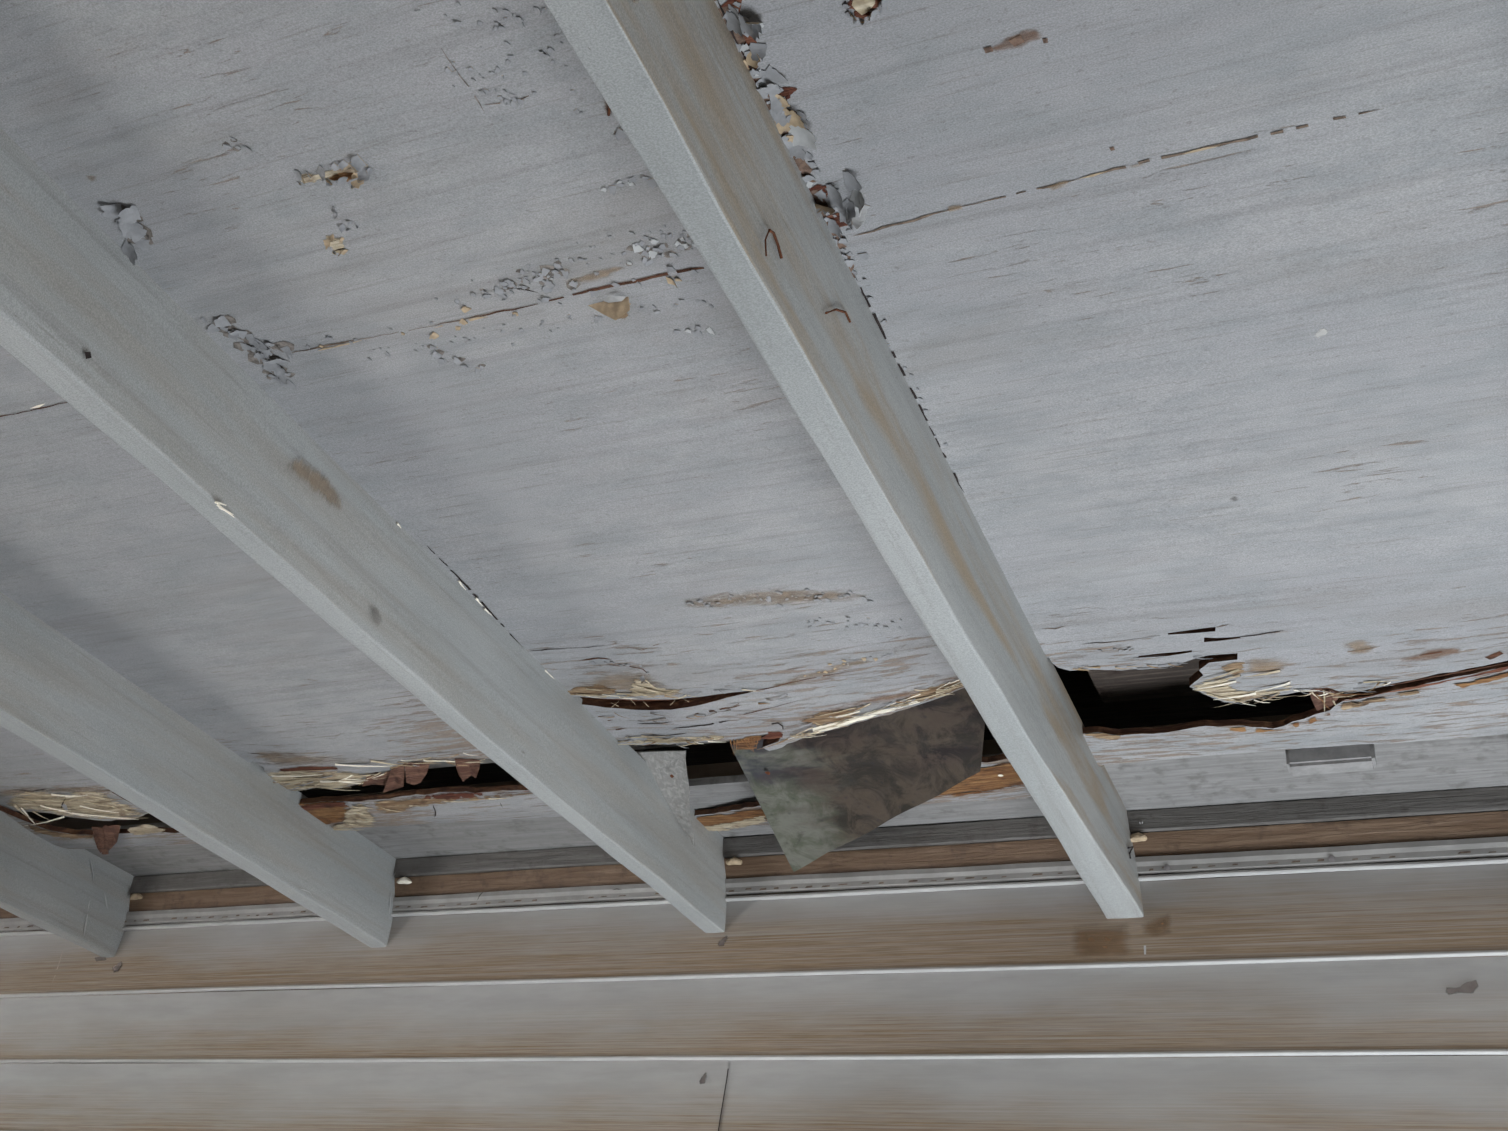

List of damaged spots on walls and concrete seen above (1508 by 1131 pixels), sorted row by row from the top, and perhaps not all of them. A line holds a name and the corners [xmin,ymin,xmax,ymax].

peeling [100,203,154,265]
peeling [294,154,373,189]
peeling [323,207,358,256]
peeling [201,225,714,390]
peeling [714,0,964,492]
crack [855,108,1384,236]